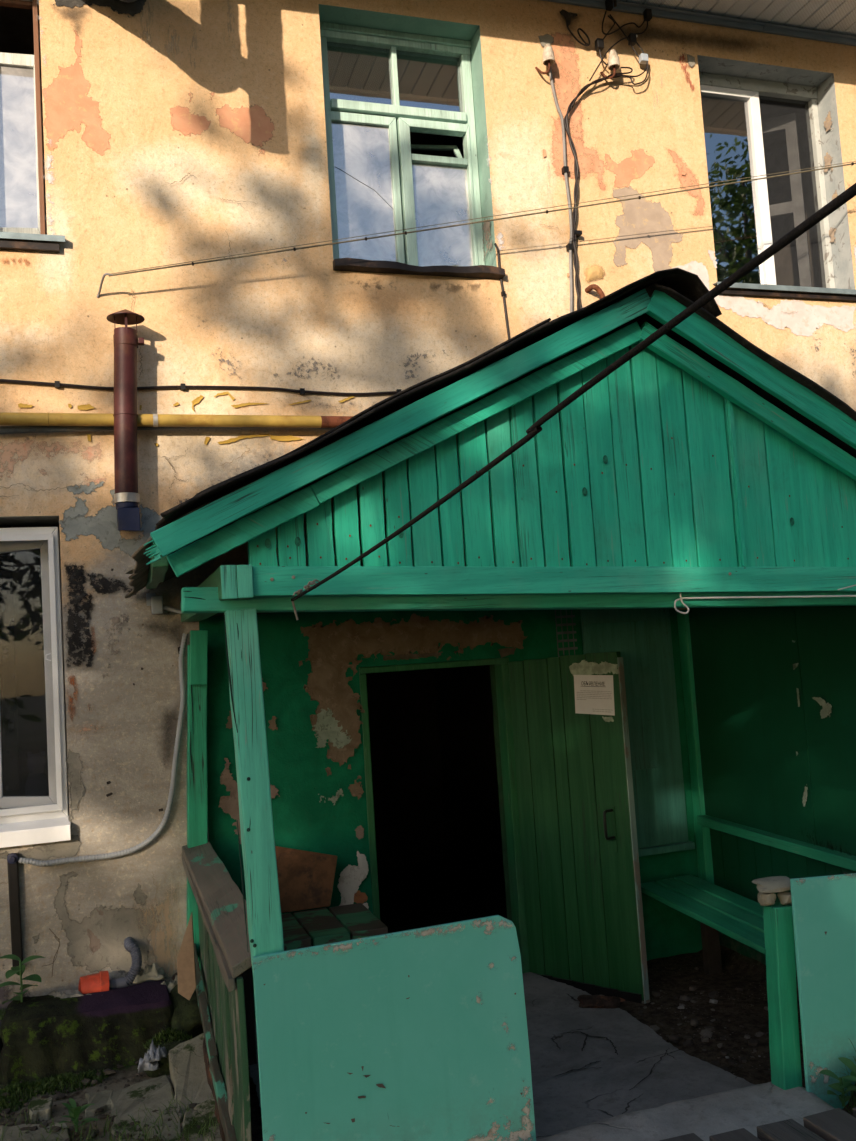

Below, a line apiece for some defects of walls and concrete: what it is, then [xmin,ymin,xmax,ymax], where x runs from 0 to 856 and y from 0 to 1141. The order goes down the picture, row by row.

peeling [42,30,111,155]
peeling [170,92,275,155]
flaking render [538,9,856,337]
peeling [0,438,102,478]
rust [321,416,353,428]
damp [64,564,136,667]
flaking render [298,613,527,805]
flaking render [219,758,241,844]
crack [556,1031,618,1076]
peeling [468,1087,533,1141]